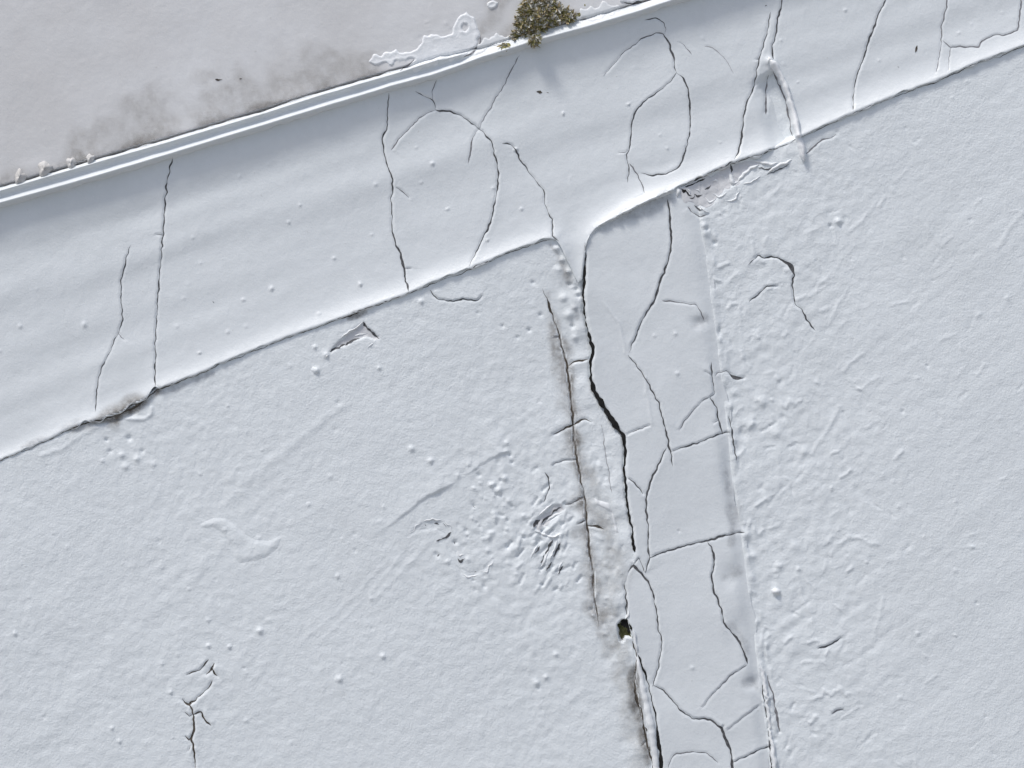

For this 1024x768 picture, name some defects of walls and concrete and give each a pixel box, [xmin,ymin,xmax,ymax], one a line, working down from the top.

peeling [574,0,641,22]
peeling [369,12,510,72]
spalling [676,159,792,213]
crack [1,56,557,461]
spalling [325,322,380,358]
crack [543,0,1024,768]
crack [183,660,217,761]